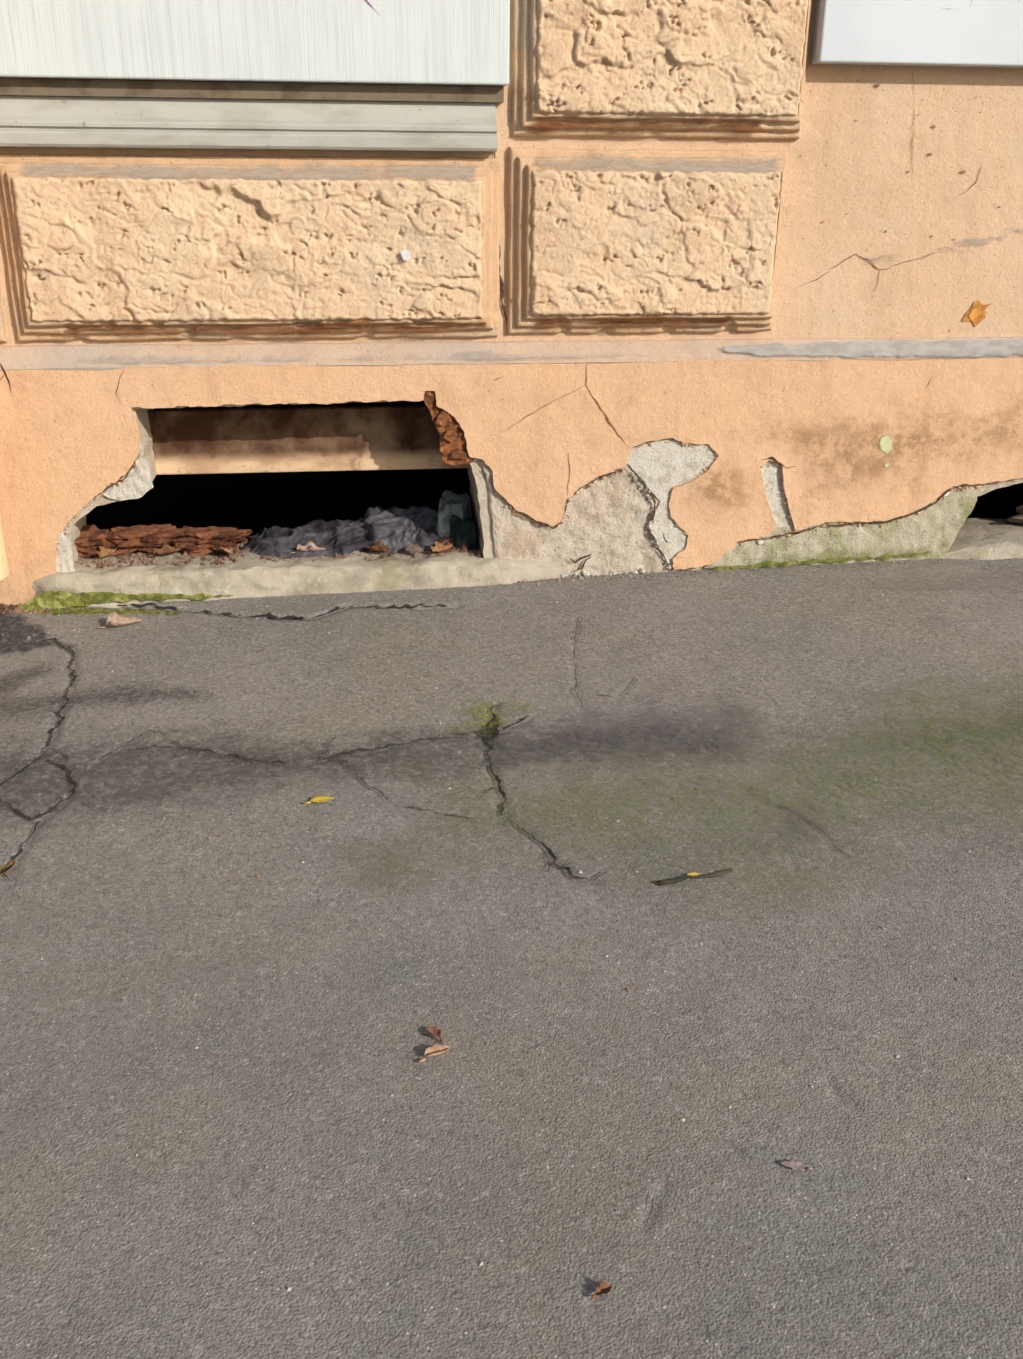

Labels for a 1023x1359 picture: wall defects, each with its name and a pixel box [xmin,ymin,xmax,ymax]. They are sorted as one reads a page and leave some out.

crack [796,251,939,295]
spalling [424,391,474,466]
crack [494,365,626,444]
peeling [879,436,893,467]
spalling [55,452,154,572]
spalling [489,438,718,579]
spalling [704,457,1021,568]
crack [117,602,450,619]
crack [573,616,636,710]
crack [0,638,609,883]